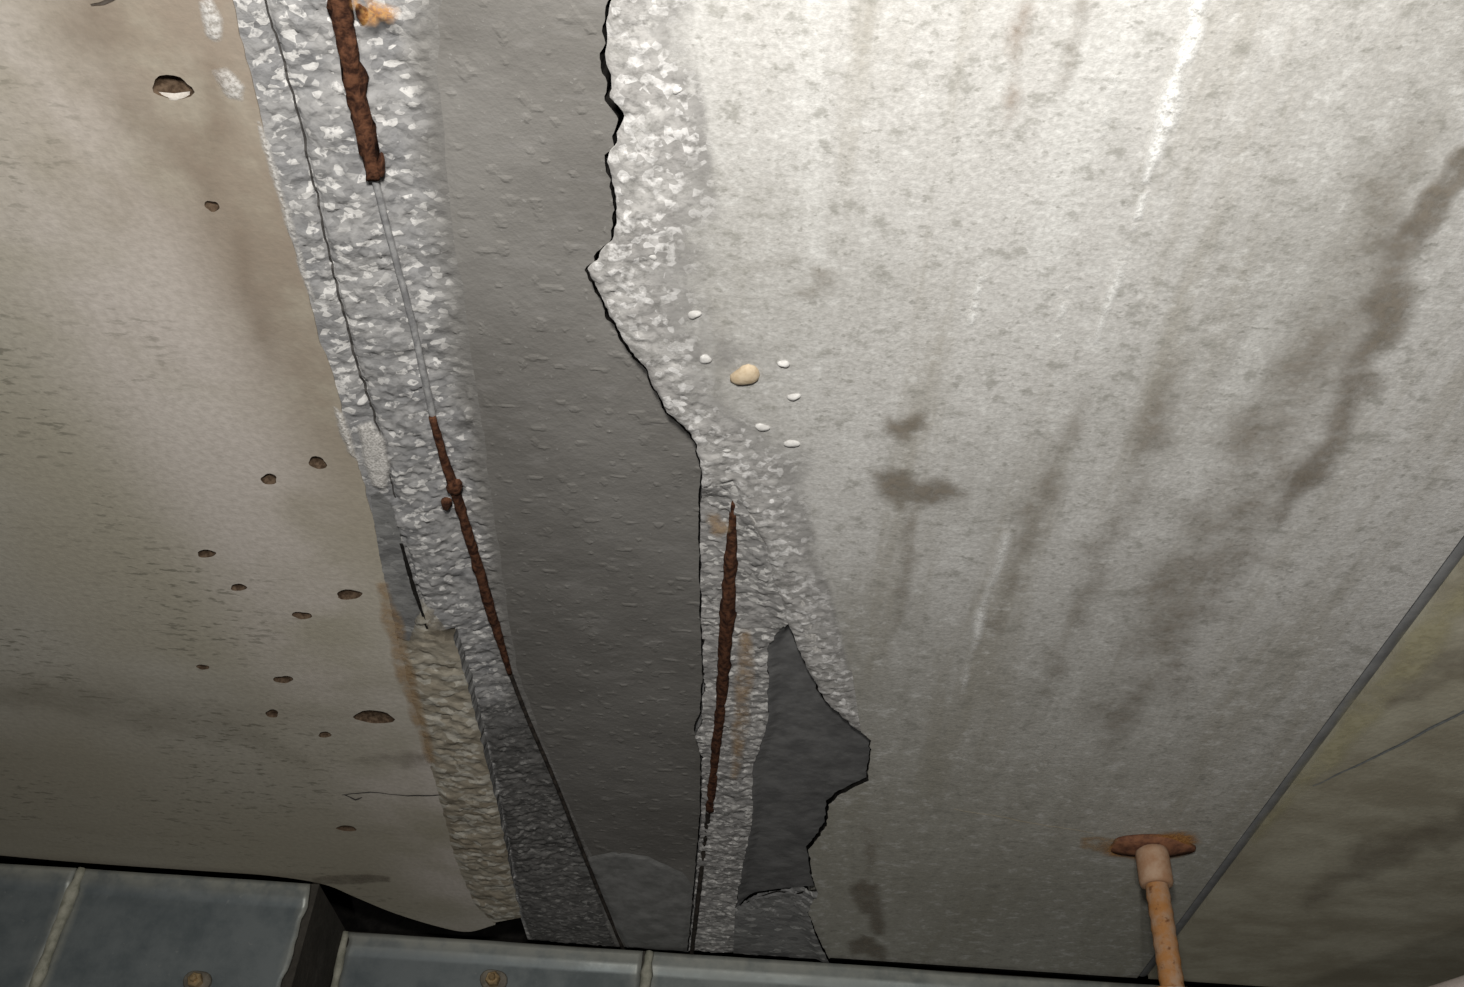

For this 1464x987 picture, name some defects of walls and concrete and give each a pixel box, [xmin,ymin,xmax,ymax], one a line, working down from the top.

corrosion [326,0,393,182]
leakage [1135,0,1206,218]
leakage [1357,149,1464,361]
corrosion [428,416,512,675]
spalling [201,0,870,963]
crack [585,0,706,946]
leakage [889,417,921,436]
leakage [881,474,954,502]
corrosion [705,501,738,814]